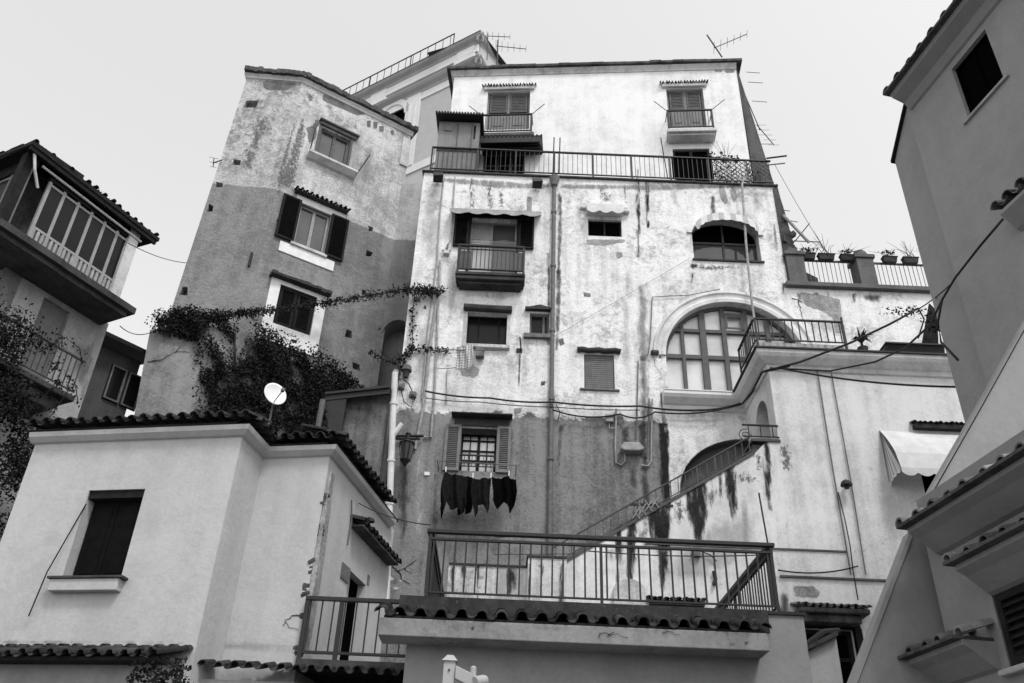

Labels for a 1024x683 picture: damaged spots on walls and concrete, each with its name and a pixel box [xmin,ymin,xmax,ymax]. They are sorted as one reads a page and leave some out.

damp [610,288,671,586]
damp [686,461,737,540]
damp [764,442,772,510]